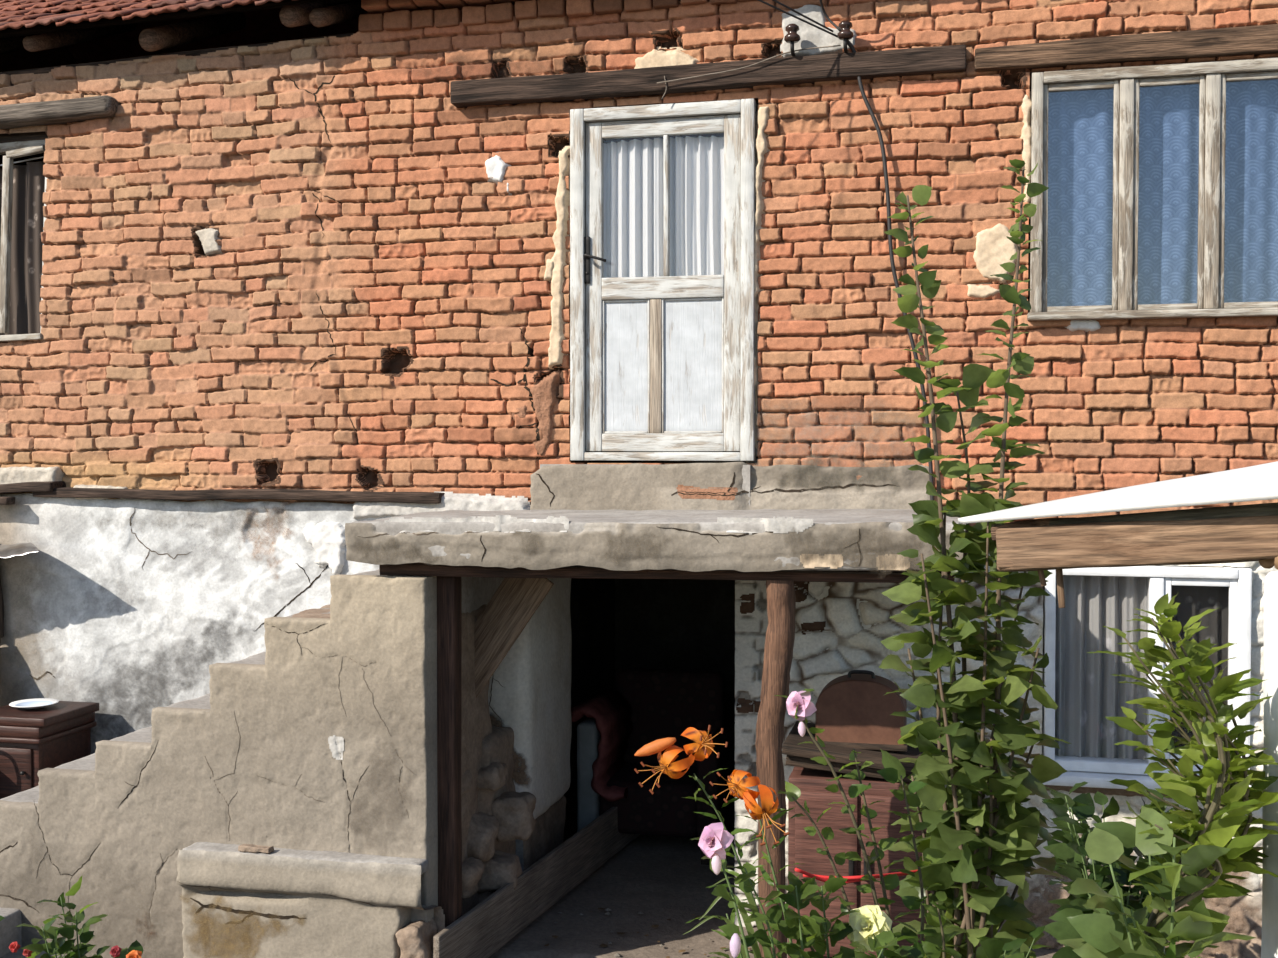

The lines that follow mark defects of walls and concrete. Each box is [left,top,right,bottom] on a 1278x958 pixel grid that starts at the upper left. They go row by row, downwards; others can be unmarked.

crack [289,70,341,143]
crack [310,290,336,369]
spalling [380,346,414,377]
crack [490,328,555,507]
spalling [253,458,283,486]
spalling [355,465,385,492]
crack [671,473,896,496]
crack [130,508,193,569]
crack [656,526,796,541]
crack [256,563,414,811]
crack [0,804,101,911]
crack [148,849,305,924]